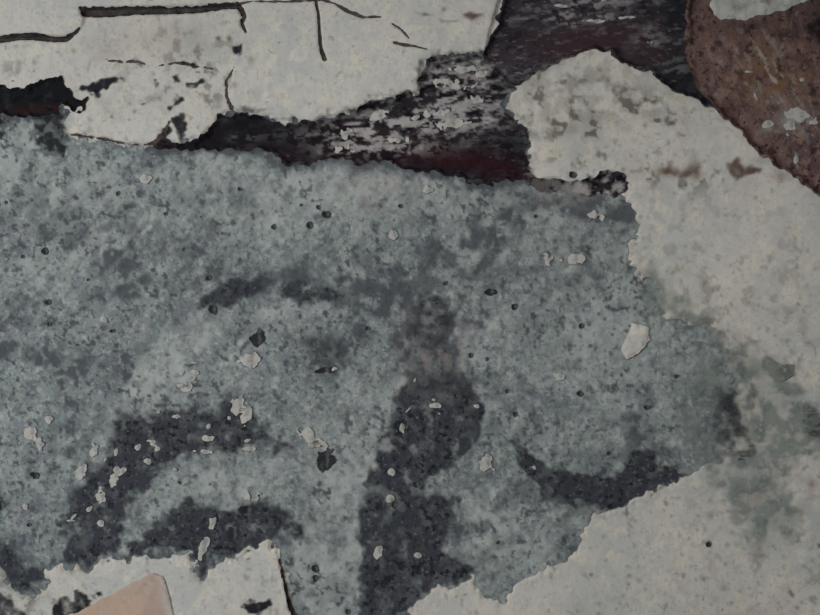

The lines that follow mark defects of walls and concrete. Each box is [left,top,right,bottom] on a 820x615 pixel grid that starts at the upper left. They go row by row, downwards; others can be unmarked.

crack [0,0,427,61]
spalling [153,0,820,196]
rust [727,159,760,178]
peeling [0,75,744,615]
water stain [414,296,454,337]
peeling [765,357,793,382]
water stain [56,401,302,577]
water stain [356,379,484,615]
water stain [511,440,682,509]
water stain [52,590,101,615]
water stain [242,599,271,615]
crack [278,558,296,615]